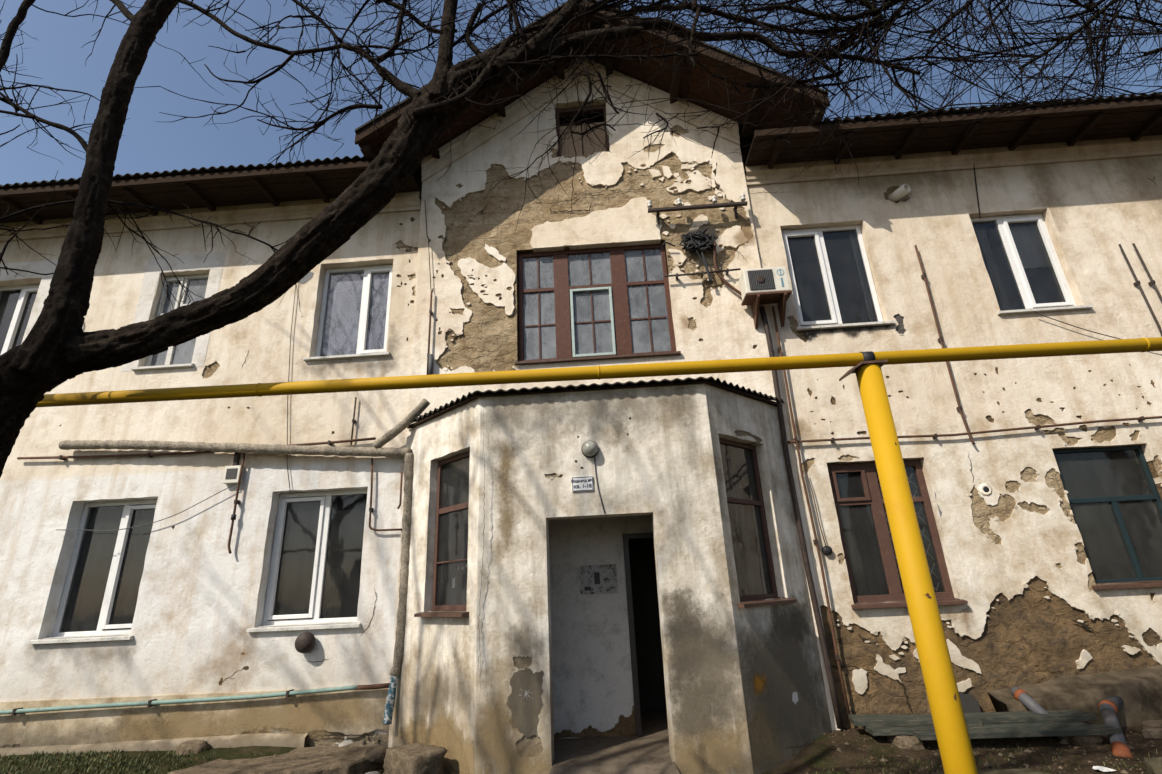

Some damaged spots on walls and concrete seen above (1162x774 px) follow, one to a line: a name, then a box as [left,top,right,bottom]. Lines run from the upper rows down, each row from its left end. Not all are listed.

flaking render [393,126,756,372]